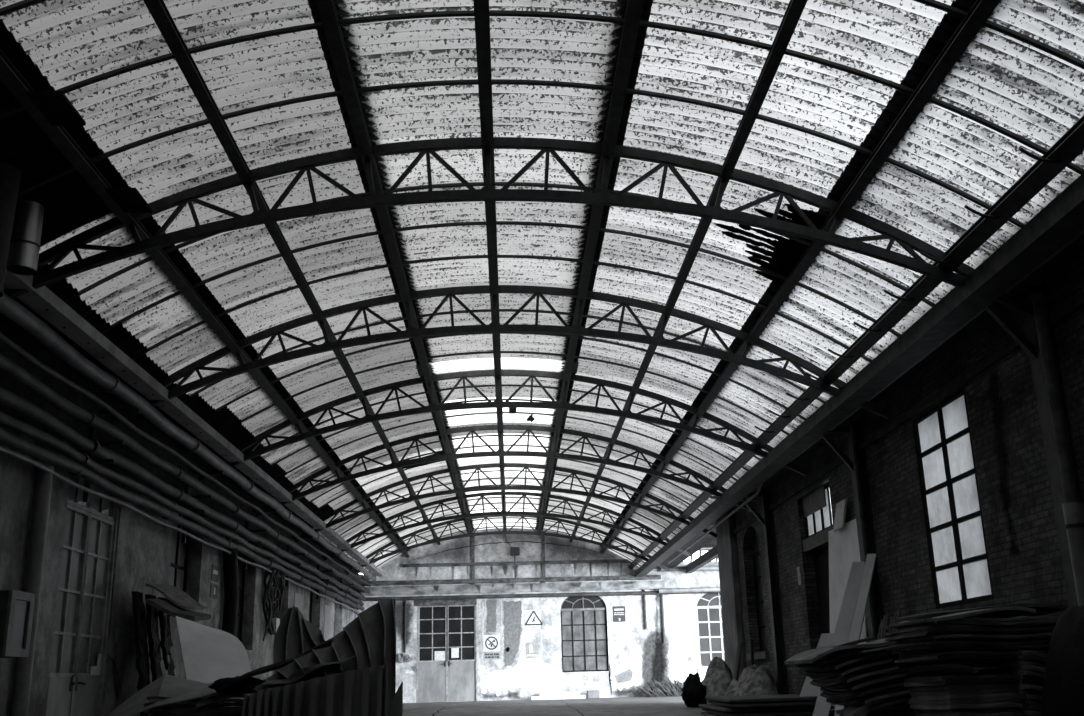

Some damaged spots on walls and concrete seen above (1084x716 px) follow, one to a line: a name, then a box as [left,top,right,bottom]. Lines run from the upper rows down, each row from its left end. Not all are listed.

flaking render [480,626,573,698]
flaking render [611,646,643,695]